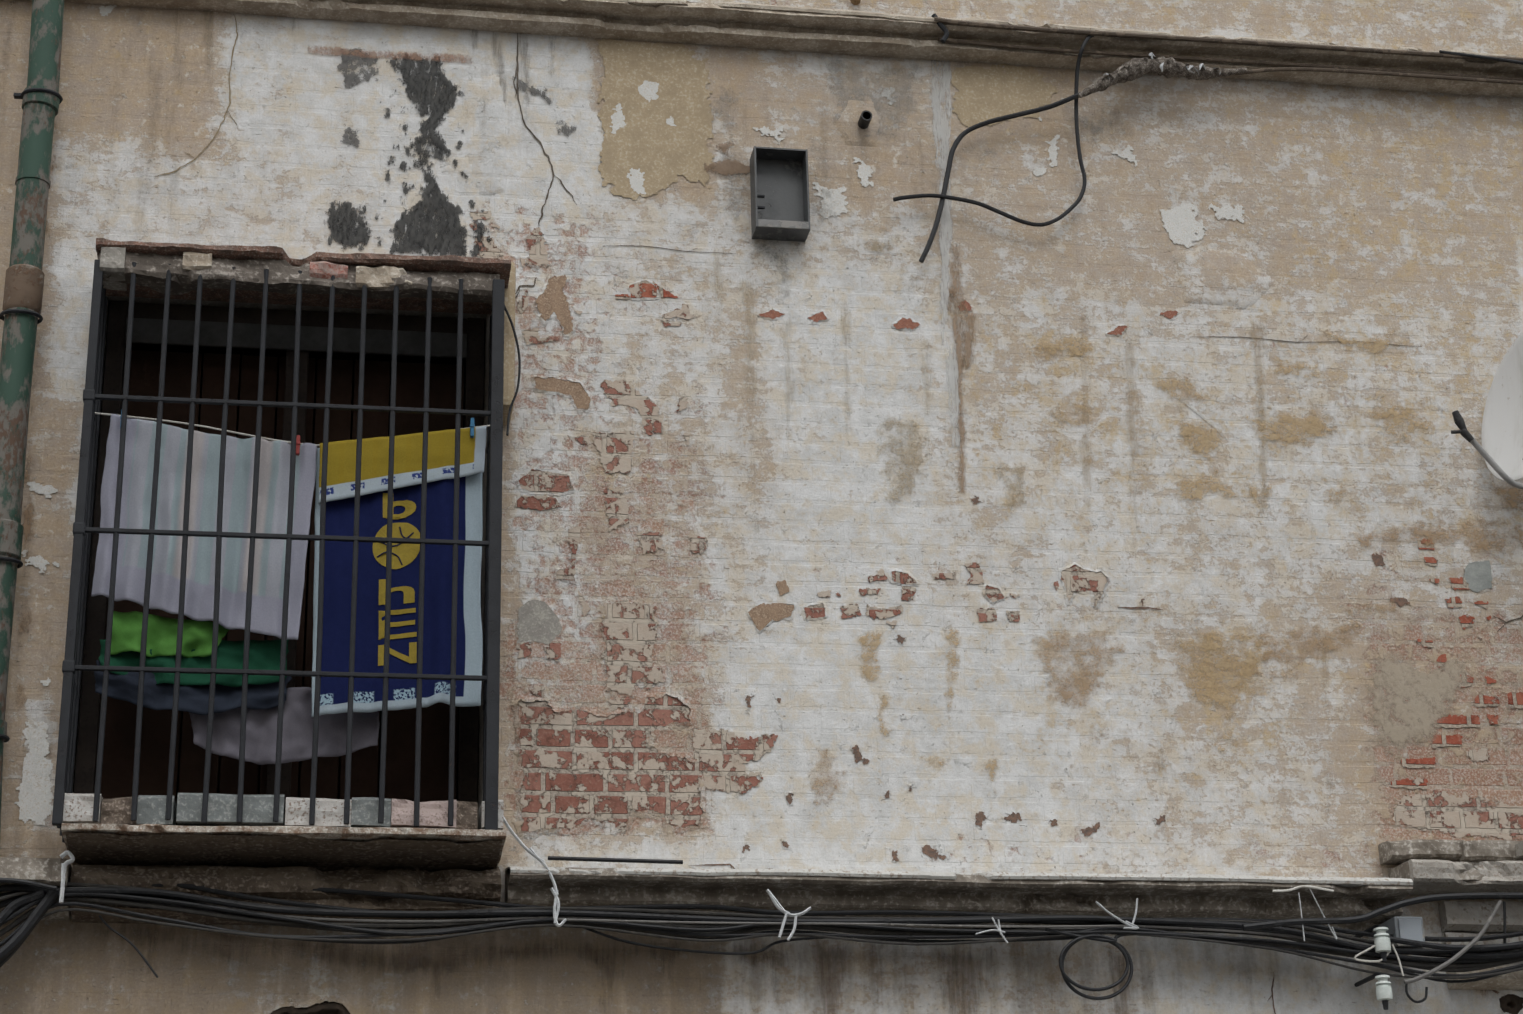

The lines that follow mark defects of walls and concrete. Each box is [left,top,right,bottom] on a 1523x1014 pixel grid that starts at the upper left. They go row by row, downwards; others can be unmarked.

crack [155,15,238,177]
crack [513,34,577,228]
flaking render [615,278,698,327]
flaking render [515,466,576,511]
flaking render [530,375,688,554]
flaking render [746,562,1020,647]
flaking render [1054,562,1110,609]
flaking render [1372,551,1385,567]
flaking render [1390,597,1412,607]
flaking render [1417,538,1491,640]
flaking render [511,526,778,839]
flaking render [1386,674,1523,841]